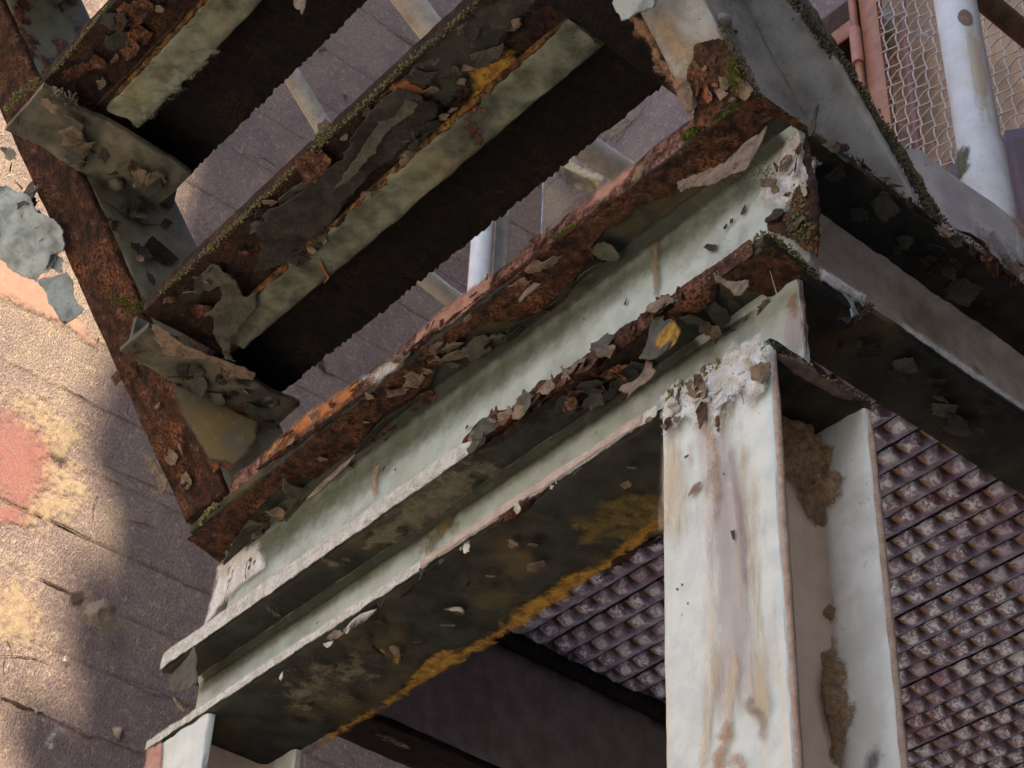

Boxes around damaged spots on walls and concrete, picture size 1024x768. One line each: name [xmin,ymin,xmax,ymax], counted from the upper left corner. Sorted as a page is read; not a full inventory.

peeling [612,0,657,21]
peeling [675,65,754,113]
corrosion [144,236,178,265]
peeling [238,18,521,272]
spalling [557,159,635,210]
peeling [676,126,767,192]
corrosion [766,182,816,252]
peeling [414,274,492,344]
corrosion [187,17,807,563]
peeling [152,263,258,465]
damp [572,443,681,547]
corrosion [712,722,745,768]